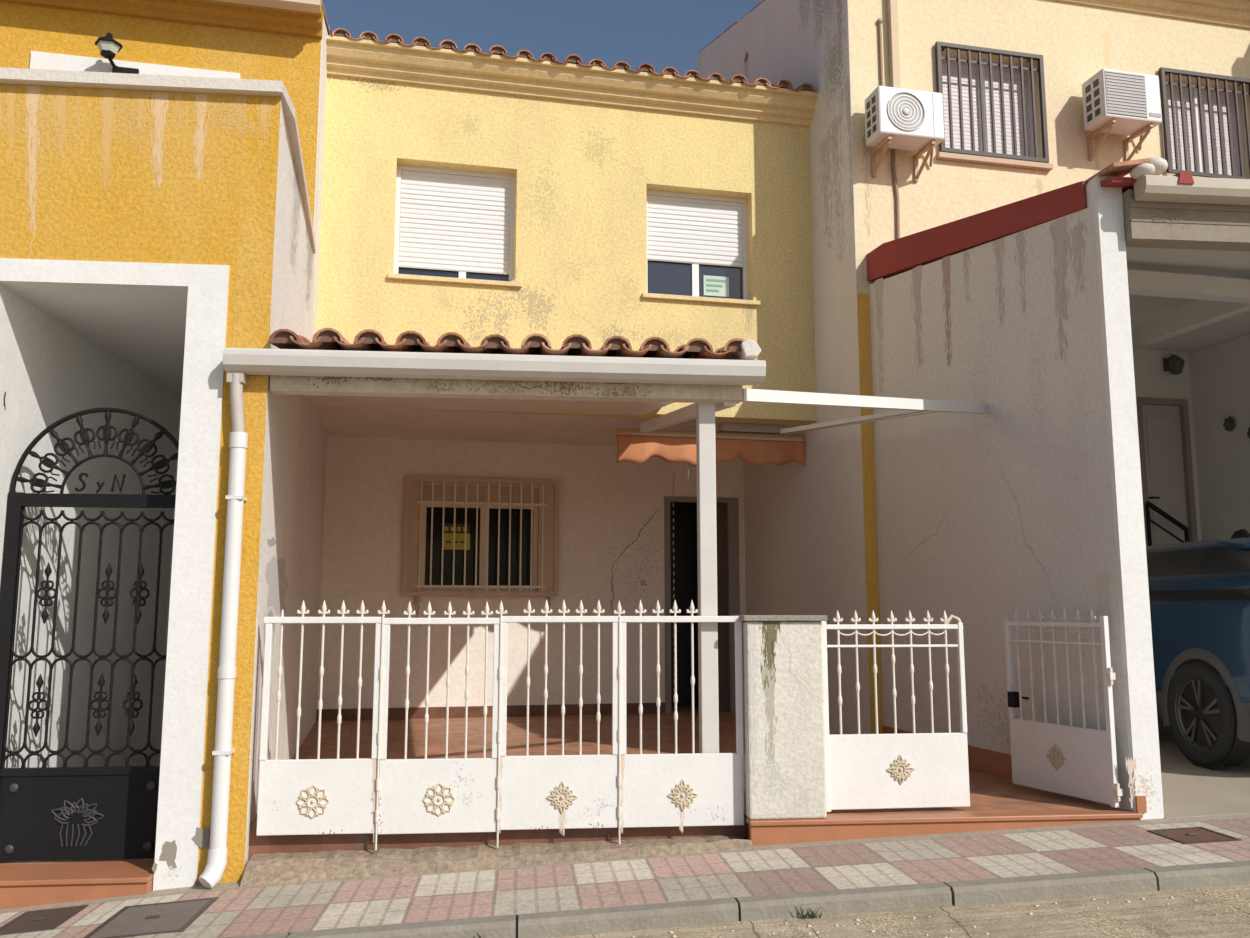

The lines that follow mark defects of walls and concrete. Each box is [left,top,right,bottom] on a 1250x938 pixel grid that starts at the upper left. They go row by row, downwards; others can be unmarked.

water stain [0,85,286,234]
water stain [798,0,872,261]
water stain [942,217,1093,502]
crack [611,475,674,611]
water stain [747,622,821,809]
spalling [152,840,177,874]
spalling [192,827,210,848]